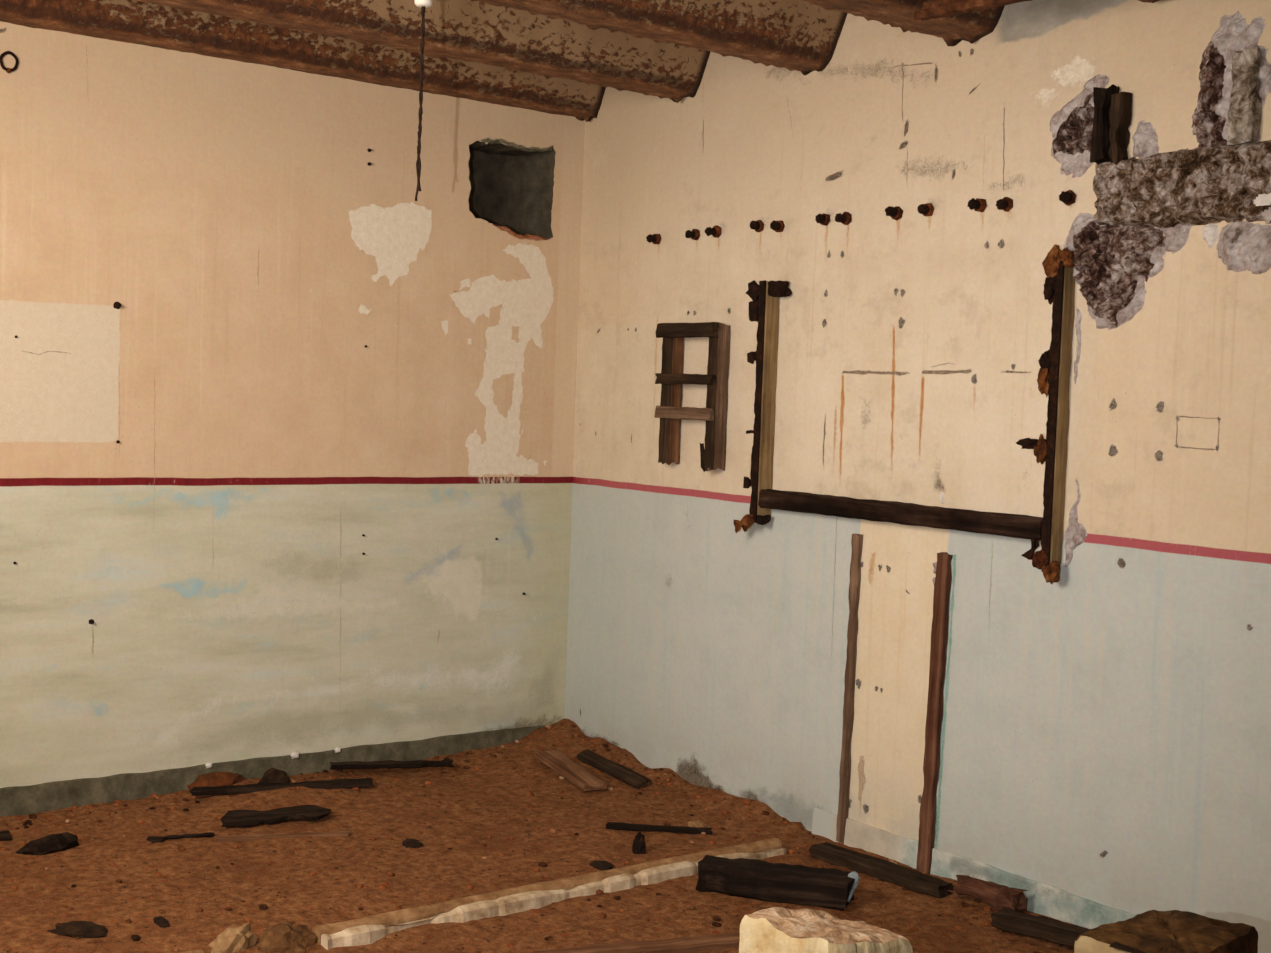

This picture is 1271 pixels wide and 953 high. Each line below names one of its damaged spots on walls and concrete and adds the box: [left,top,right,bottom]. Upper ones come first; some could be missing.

spalling [1030,55,1110,178]
spalling [1132,120,1159,158]
spalling [1191,11,1271,149]
peeling [349,202,432,286]
peeling [449,138,556,477]
spalling [1063,193,1271,384]
rust [832,375,845,486]
spalling [1065,479,1087,567]